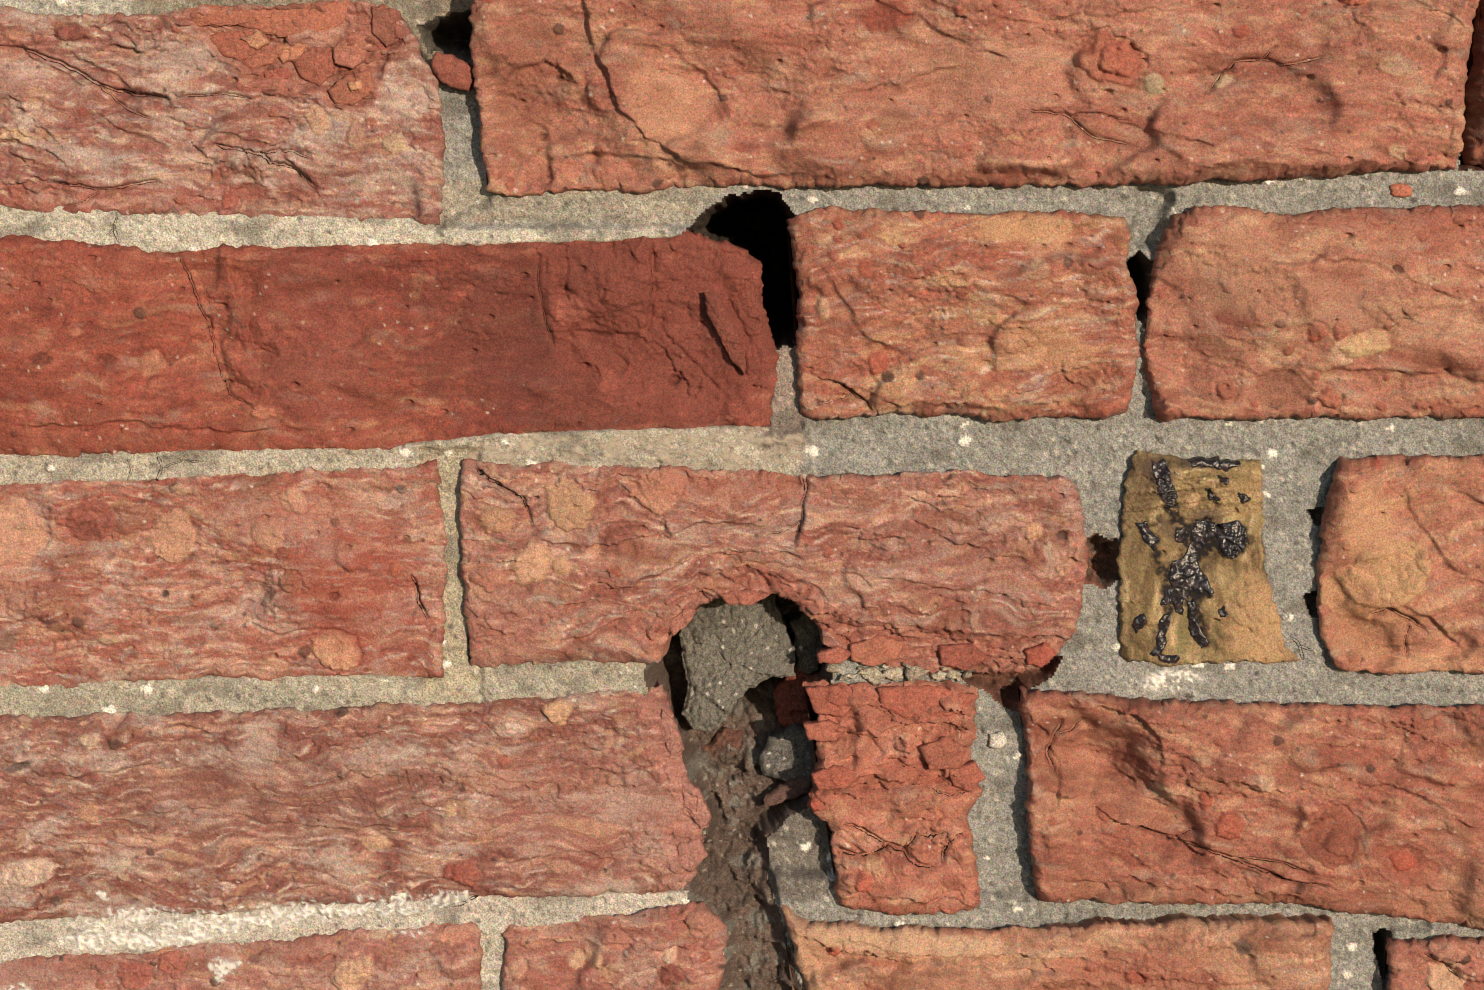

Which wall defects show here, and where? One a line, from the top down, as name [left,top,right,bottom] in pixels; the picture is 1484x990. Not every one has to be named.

crack [178,255,256,410]
spalling [537,230,780,427]
spalling [629,566,1076,990]